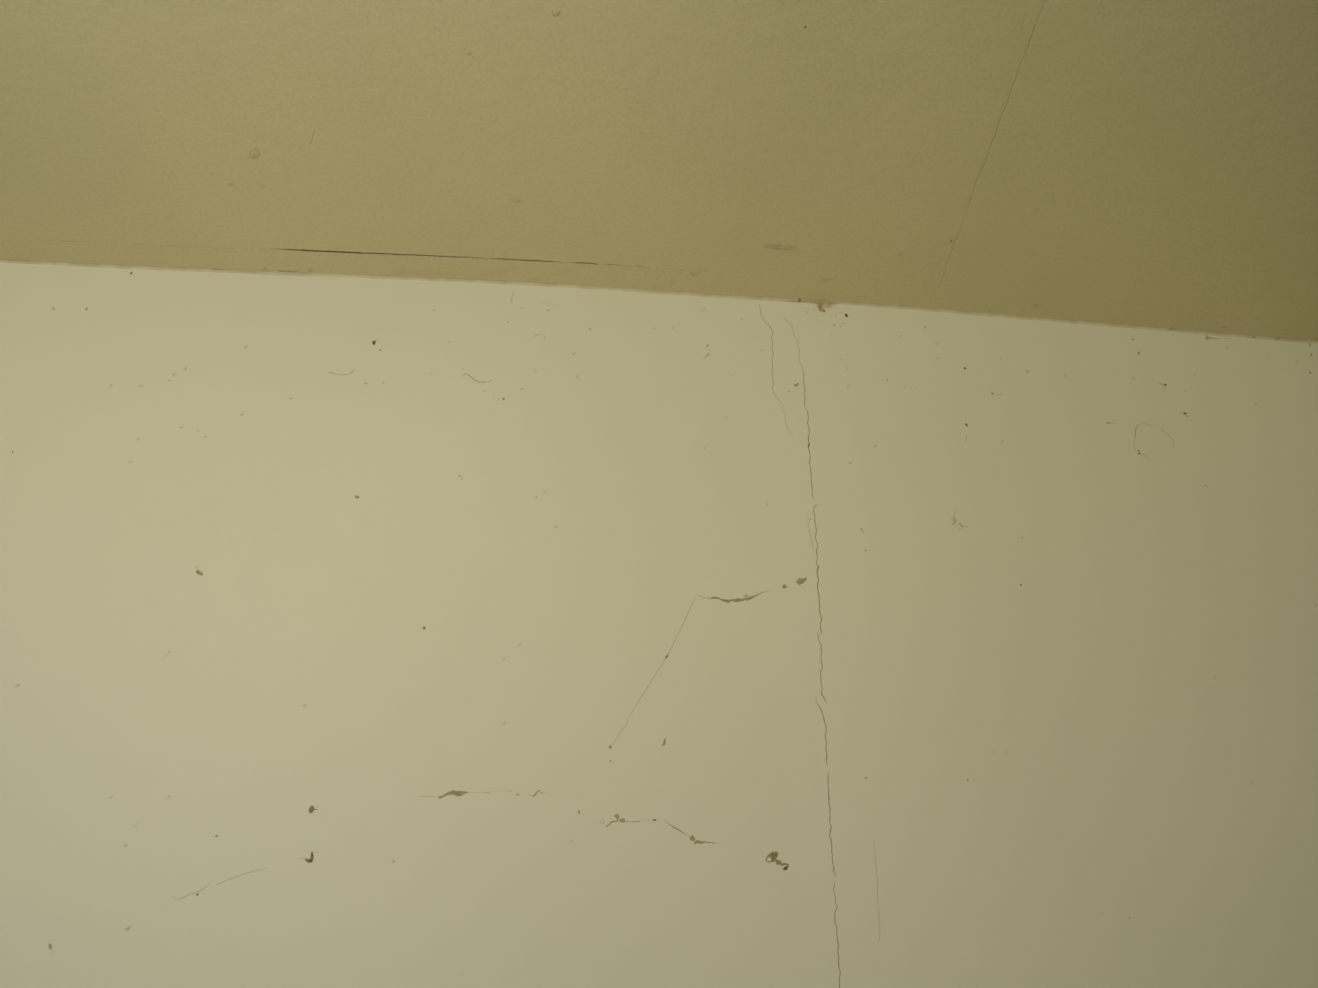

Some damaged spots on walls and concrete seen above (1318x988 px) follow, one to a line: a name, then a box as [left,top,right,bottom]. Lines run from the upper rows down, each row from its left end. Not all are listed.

crack [182,246,699,273]
crack [710,373,841,988]
crack [439,790,468,798]
crack [578,811,712,844]